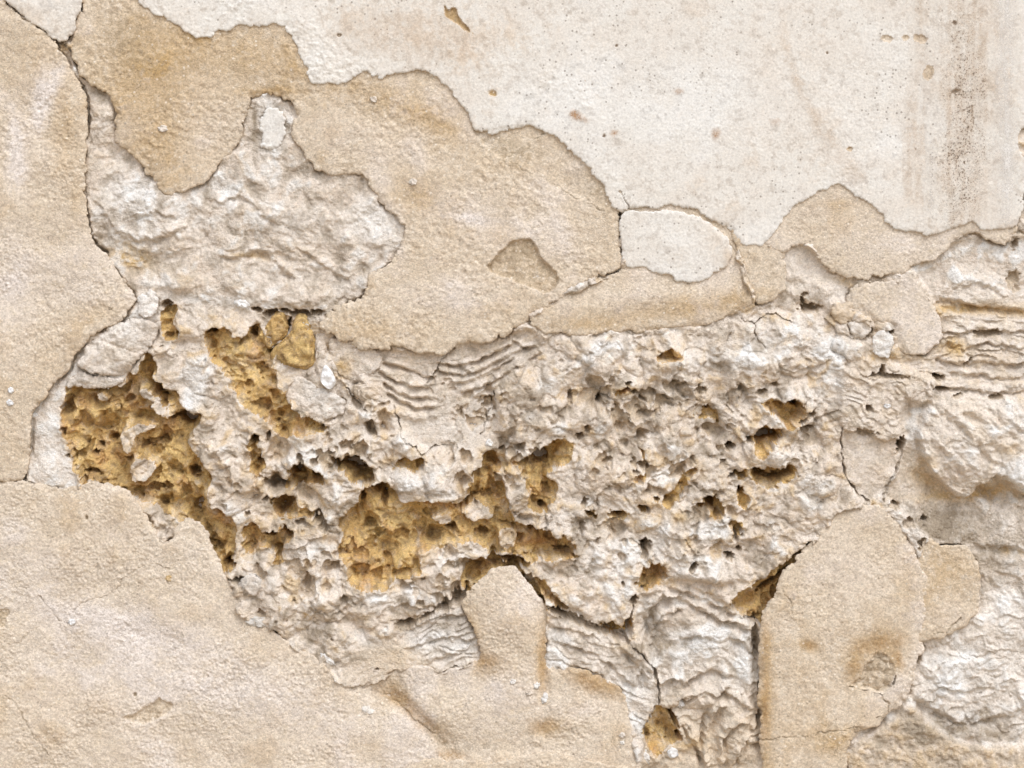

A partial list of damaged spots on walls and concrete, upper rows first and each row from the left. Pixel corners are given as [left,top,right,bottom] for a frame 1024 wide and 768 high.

crack [85,106,93,156]
crack [86,183,109,255]
flaking render [70,0,733,356]
spalling [26,184,1024,768]
crack [840,427,904,505]
crack [620,596,662,722]